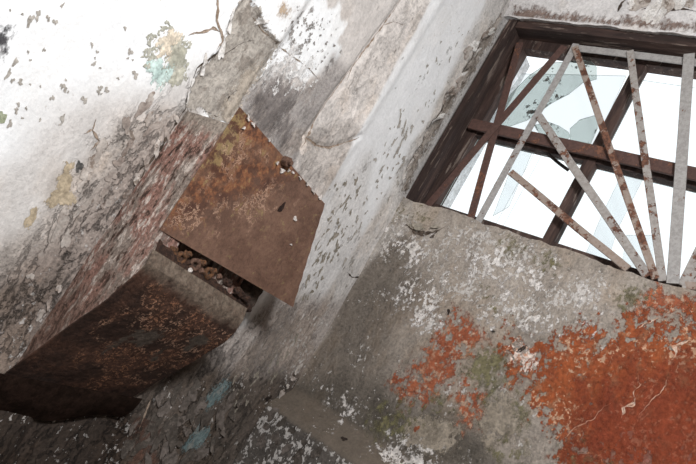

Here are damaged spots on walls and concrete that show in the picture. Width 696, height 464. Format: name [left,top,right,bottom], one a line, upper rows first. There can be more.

spalling [4,57,31,86]
spalling [0,102,27,128]
spalling [21,0,318,249]
leakage [252,70,299,147]
peeling [36,285,62,321]